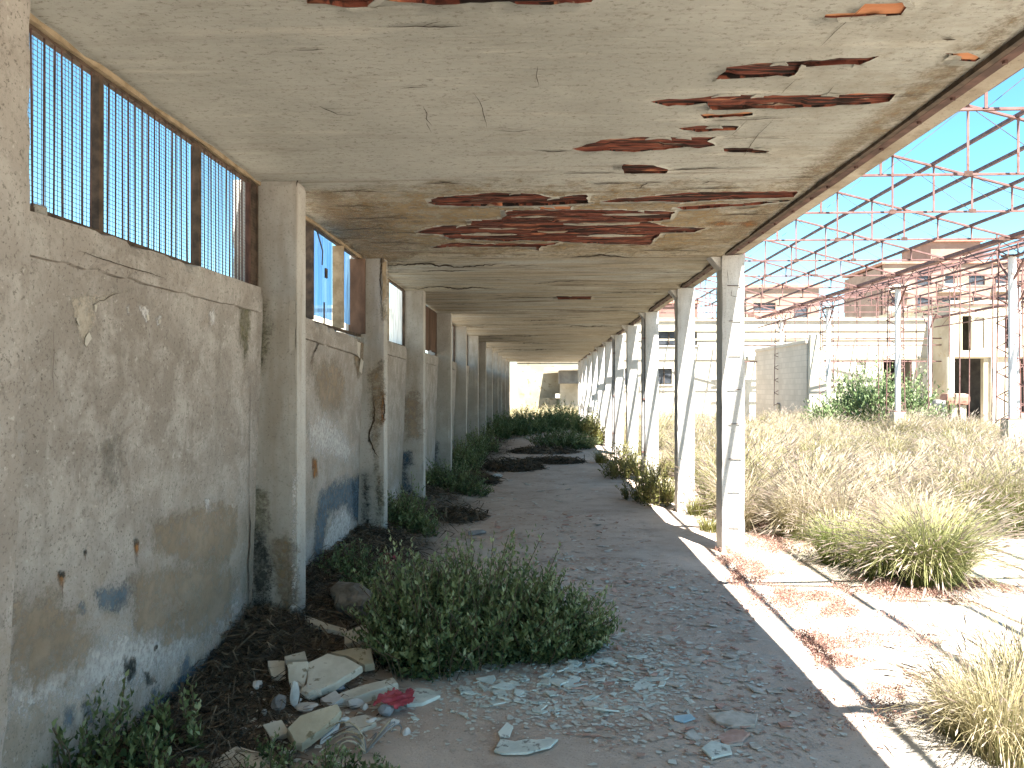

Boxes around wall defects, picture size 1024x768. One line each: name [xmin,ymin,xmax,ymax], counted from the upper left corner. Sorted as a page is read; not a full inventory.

spalling [334,0,387,13]
spalling [825,0,915,23]
spalling [577,57,894,176]
spalling [420,191,797,250]
crack [80,251,160,277]
crack [368,400,379,458]
water stain [7,474,306,725]